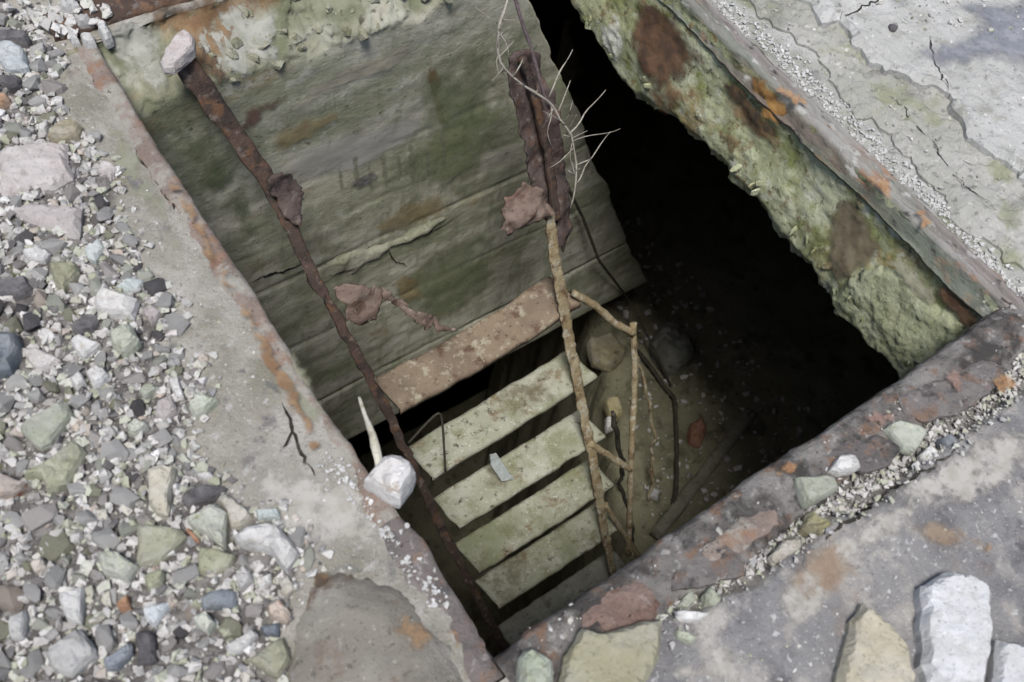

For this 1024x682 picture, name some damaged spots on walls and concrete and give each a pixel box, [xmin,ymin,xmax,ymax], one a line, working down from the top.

crack [840,0,879,18]
crack [930,39,949,89]
rust [243,102,277,129]
rust [724,77,807,142]
crack [892,97,996,210]
rust [871,176,890,198]
rust [241,309,320,449]
crack [282,403,315,476]